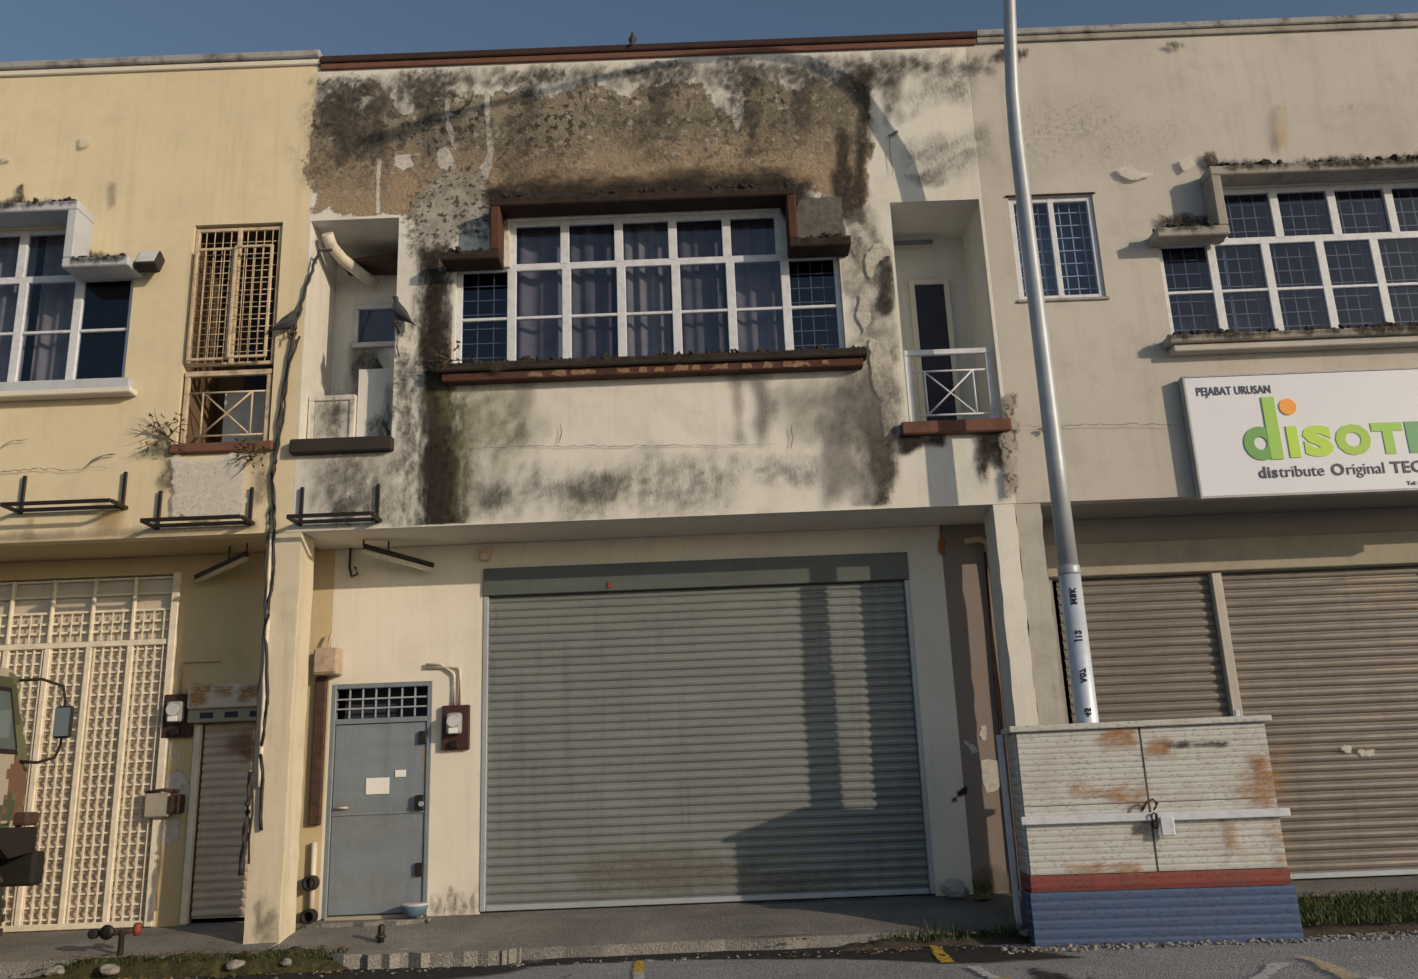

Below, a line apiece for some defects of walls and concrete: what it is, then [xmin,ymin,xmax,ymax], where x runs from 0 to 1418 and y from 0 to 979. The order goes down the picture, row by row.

peeling [302,70,896,437]
damp [312,49,1028,525]
crack [0,439,116,472]
peeling [964,725,1001,793]
rust [1102,729,1227,754]